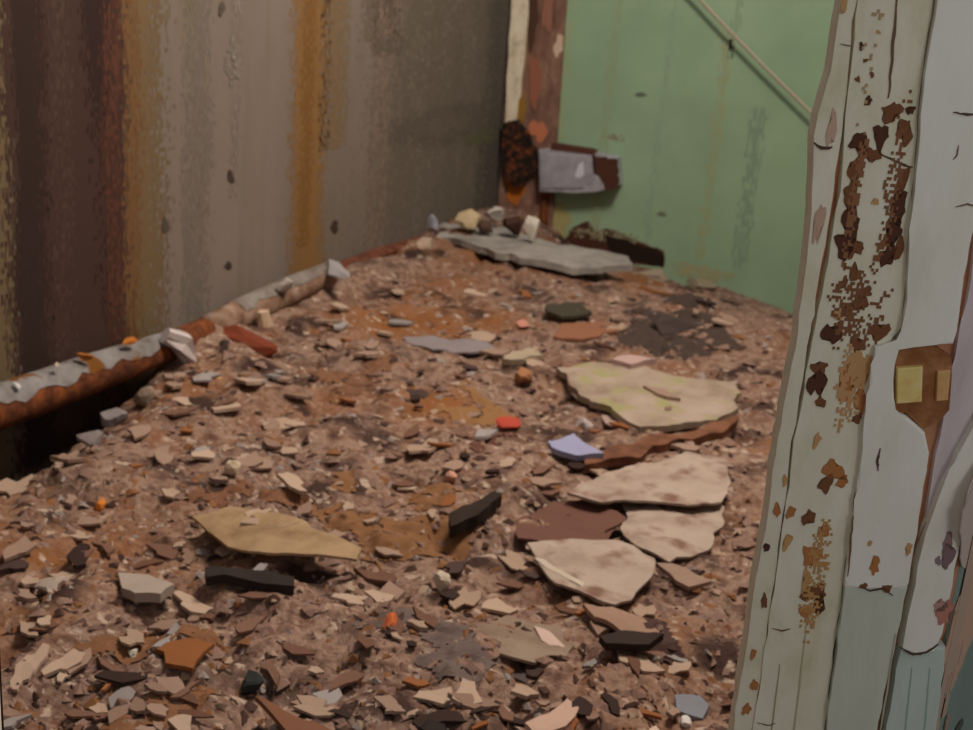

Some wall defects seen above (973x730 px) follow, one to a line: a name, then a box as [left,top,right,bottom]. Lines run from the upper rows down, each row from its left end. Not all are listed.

rust [97,0,147,348]
rust [284,0,333,277]
rust [806,9,916,433]
rust [105,373,145,409]
rust [817,458,849,495]
peeling [933,477,973,730]